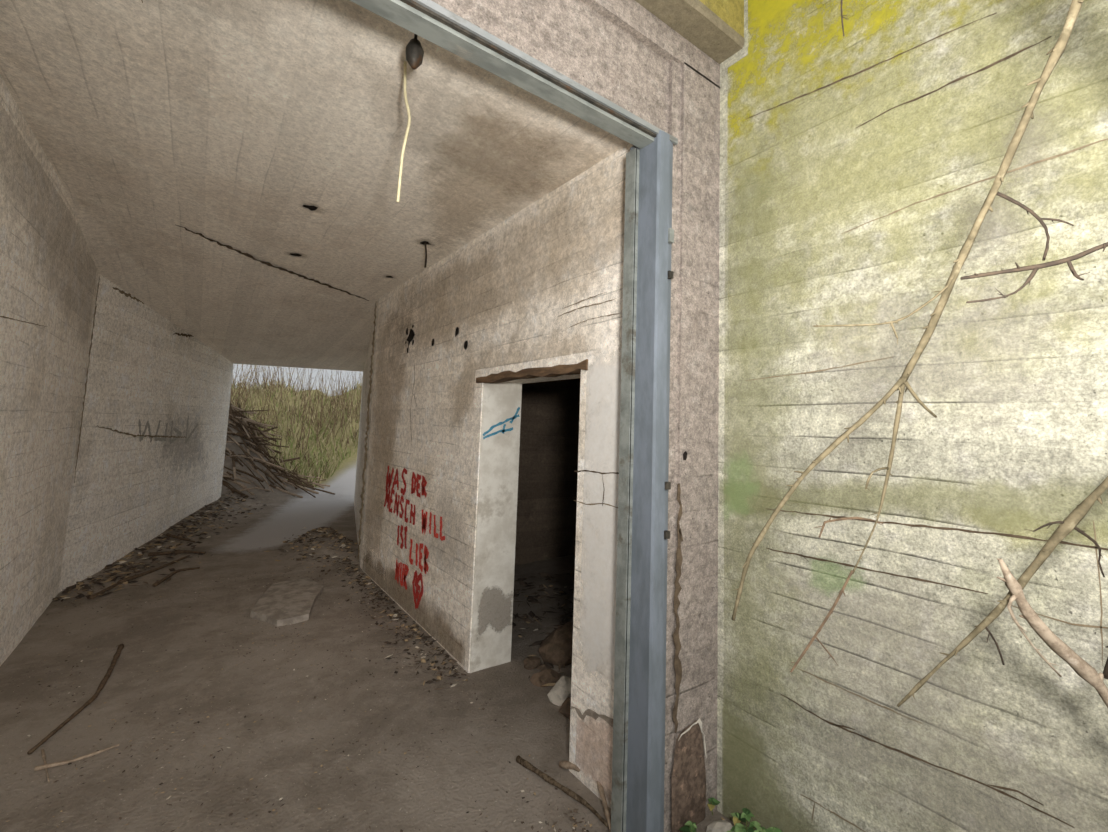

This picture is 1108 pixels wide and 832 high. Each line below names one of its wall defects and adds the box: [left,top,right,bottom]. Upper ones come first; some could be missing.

spalling [478,588,513,635]
crack [673,483,683,733]
spalling [671,718,707,832]